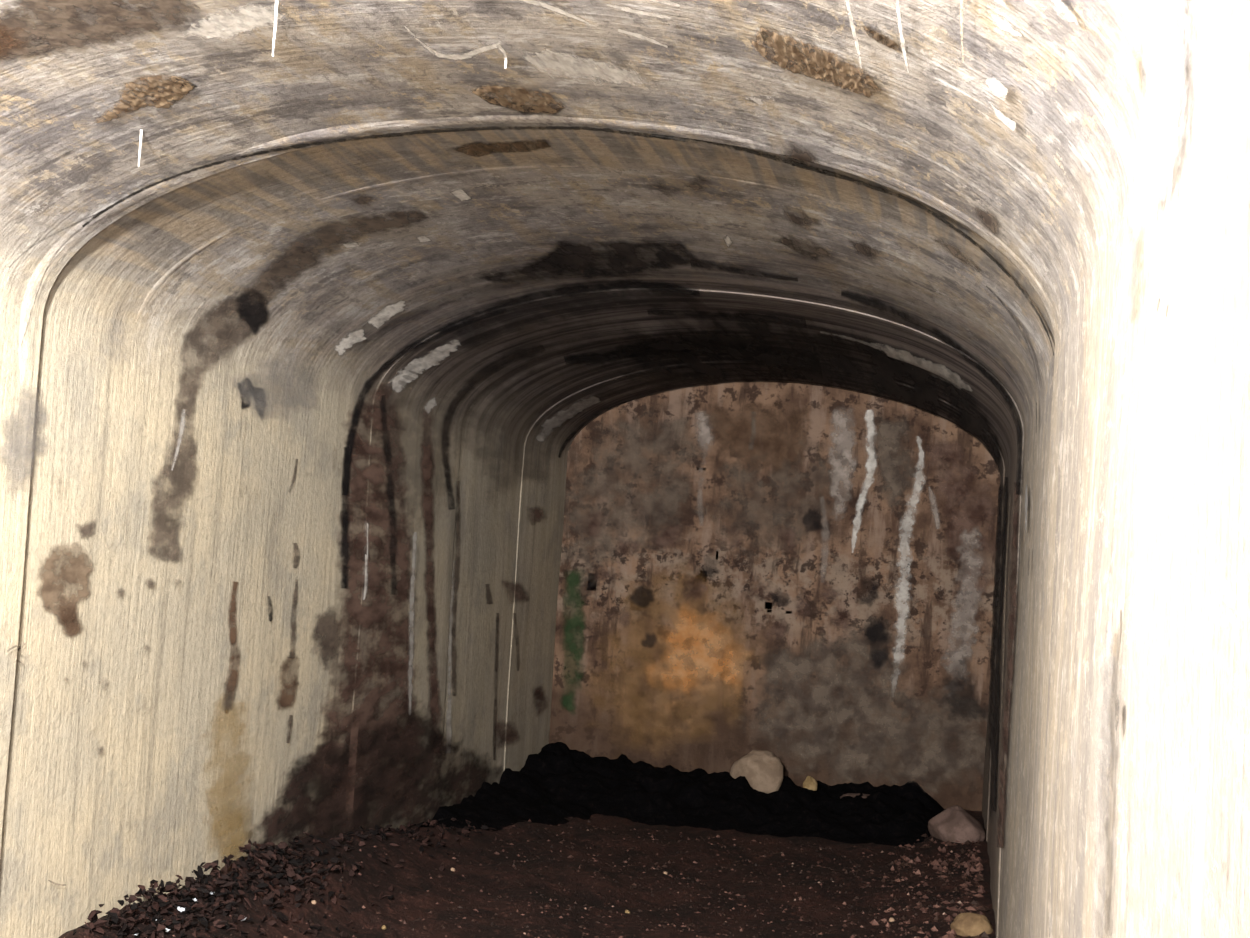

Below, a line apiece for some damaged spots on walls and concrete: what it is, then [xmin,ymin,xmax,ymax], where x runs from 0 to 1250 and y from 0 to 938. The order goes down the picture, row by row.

spalling [751,27,881,98]
spalling [96,75,197,123]
spalling [472,85,564,114]
spalling [455,140,551,157]
damp [480,242,694,282]
damp [150,196,426,561]
damp [829,410,876,549]
damp [248,340,518,855]
damp [486,582,528,673]
damp [623,587,653,624]
damp [760,435,1018,848]
damp [534,687,545,713]